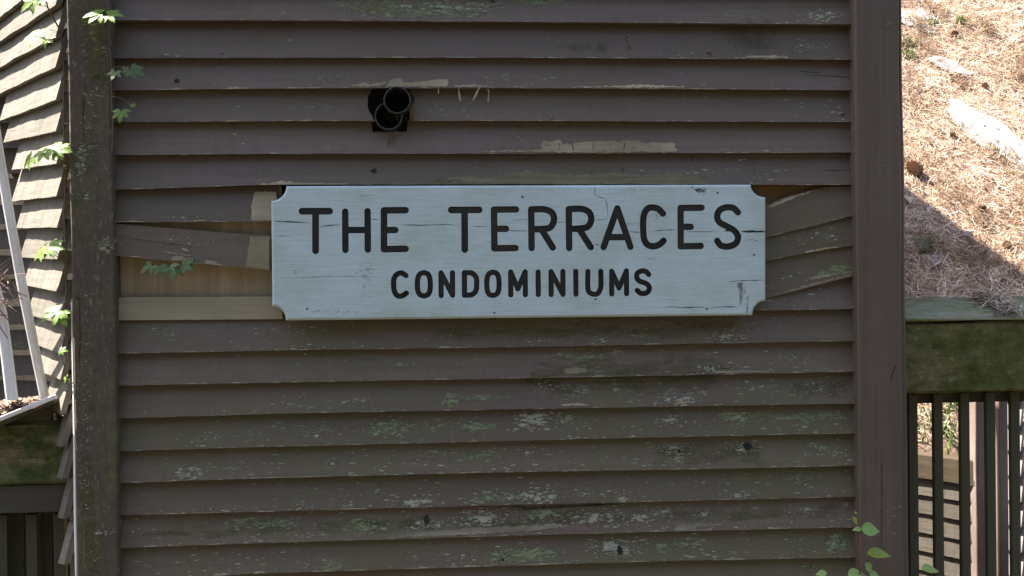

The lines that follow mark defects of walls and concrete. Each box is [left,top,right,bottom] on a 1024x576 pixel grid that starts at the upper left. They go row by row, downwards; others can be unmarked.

spalling [351,78,489,132]
peeling [483,140,678,153]